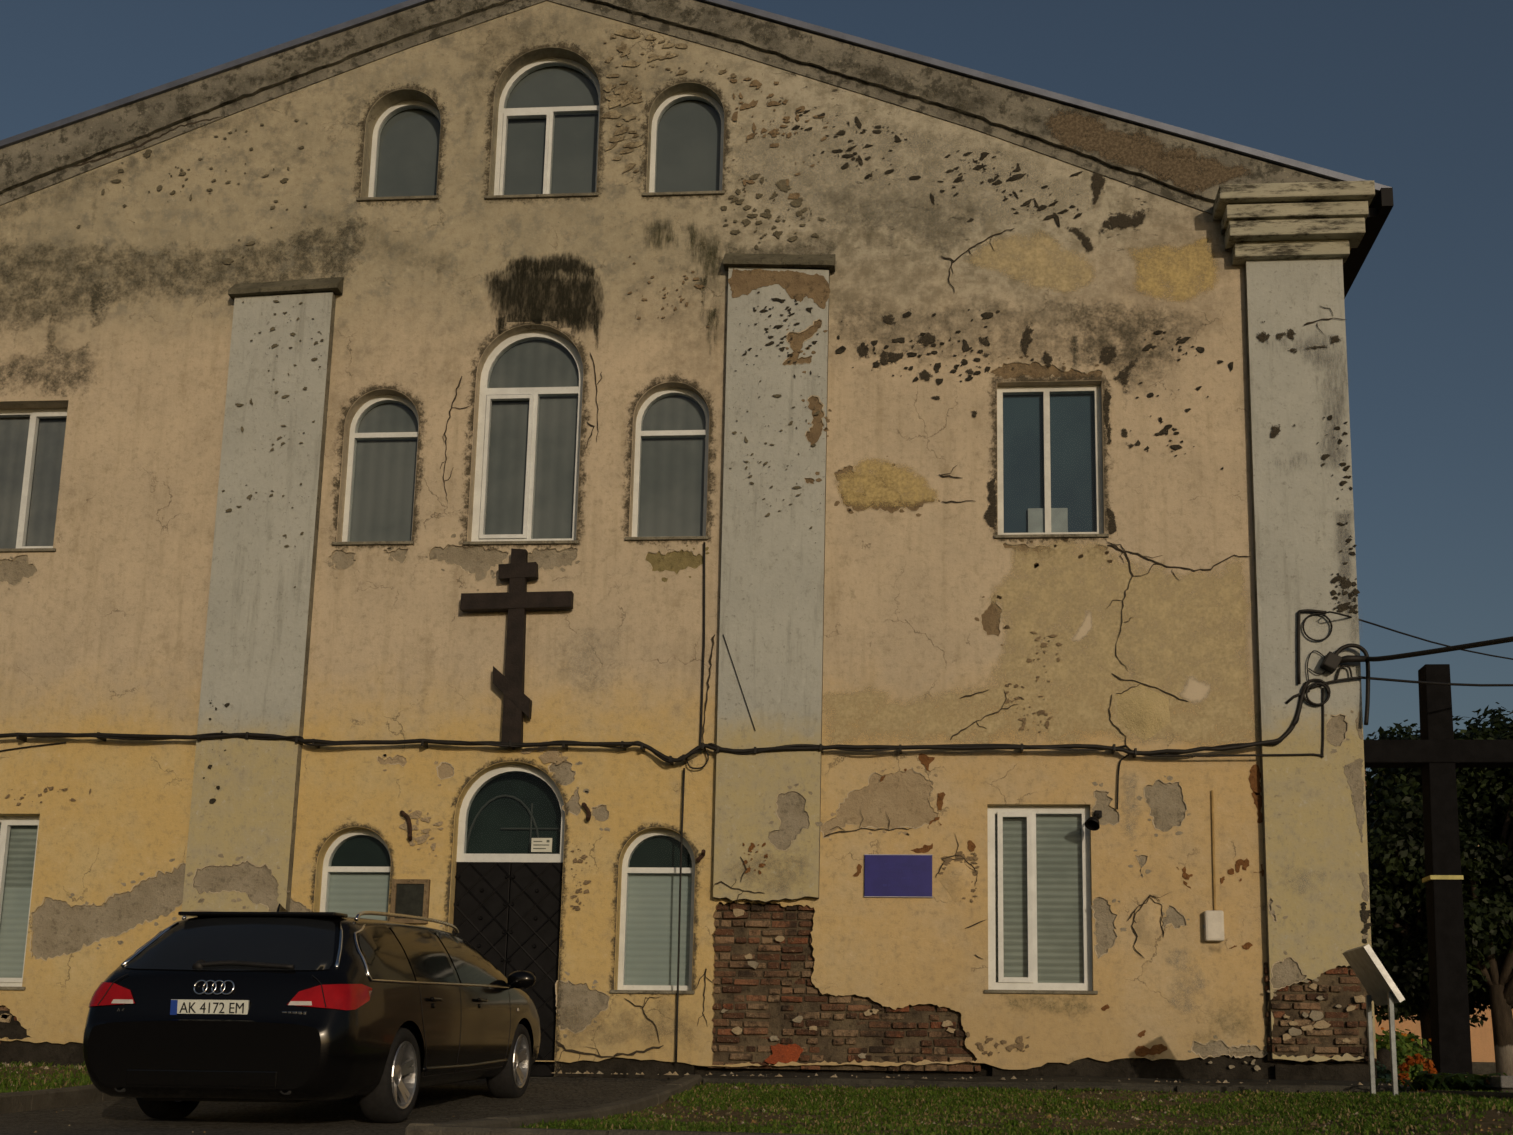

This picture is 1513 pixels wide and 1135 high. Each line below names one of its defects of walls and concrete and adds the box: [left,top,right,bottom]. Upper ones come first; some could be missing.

spalling [602,29,1146,252]
damp [0,352,89,391]
damp [0,226,355,326]
damp [460,254,602,550]
peeling [728,268,1233,543]
crack [951,689,1023,739]
peeling [825,478,1259,745]
crack [1107,542,1251,749]
peeling [1317,415,1360,614]
spalling [29,853,312,961]
spalling [708,902,1030,1072]
spalling [1188,951,1377,1071]